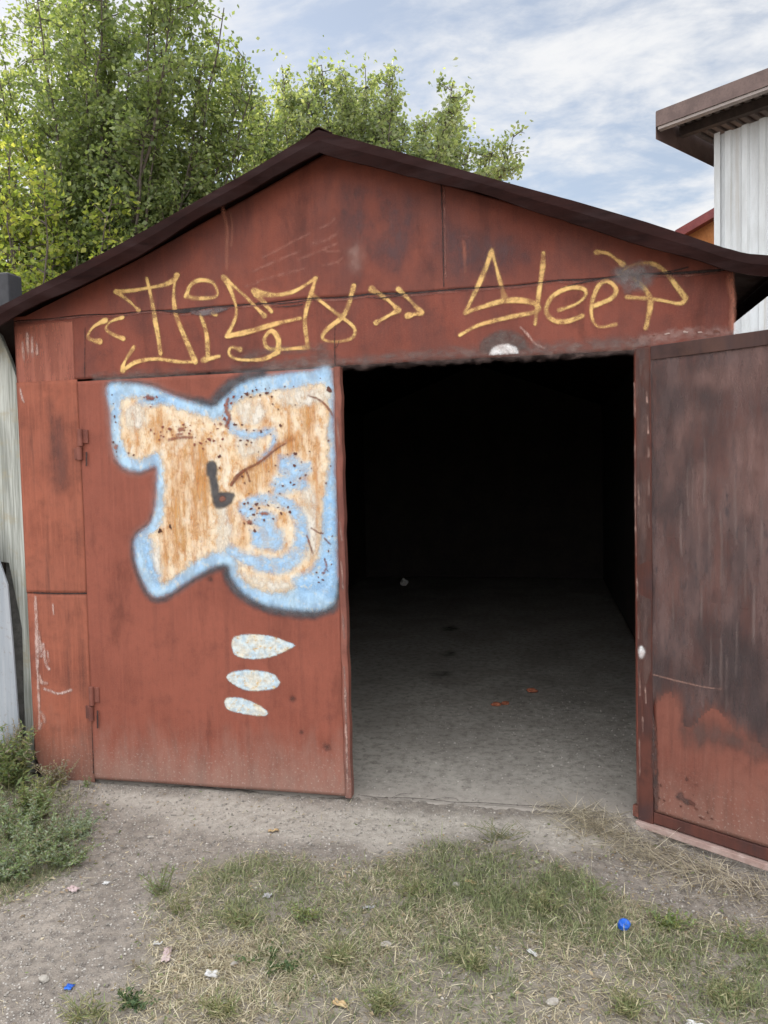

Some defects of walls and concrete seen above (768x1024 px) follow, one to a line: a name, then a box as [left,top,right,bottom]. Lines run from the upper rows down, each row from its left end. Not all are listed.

rust [126,402,322,571]